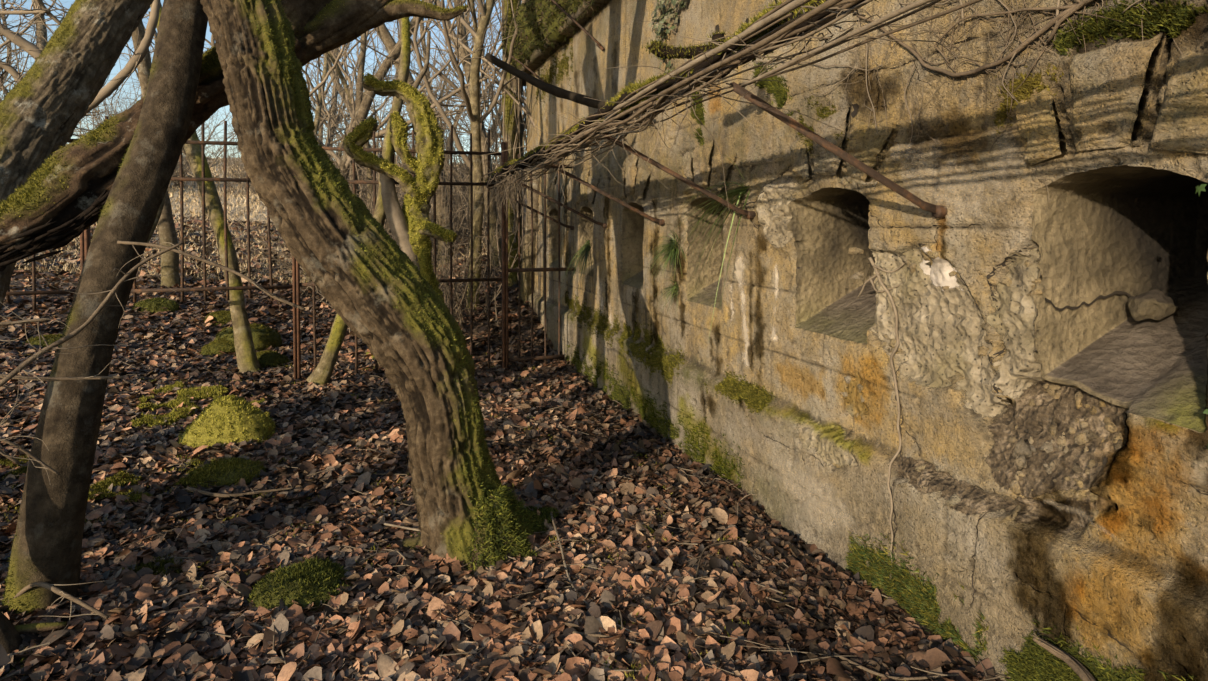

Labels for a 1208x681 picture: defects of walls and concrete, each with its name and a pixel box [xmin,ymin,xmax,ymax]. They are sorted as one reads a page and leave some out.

crack [880,361,995,611]
spalling [848,244,1128,533]
crack [1067,605,1133,653]
leakage [1145,559,1208,681]